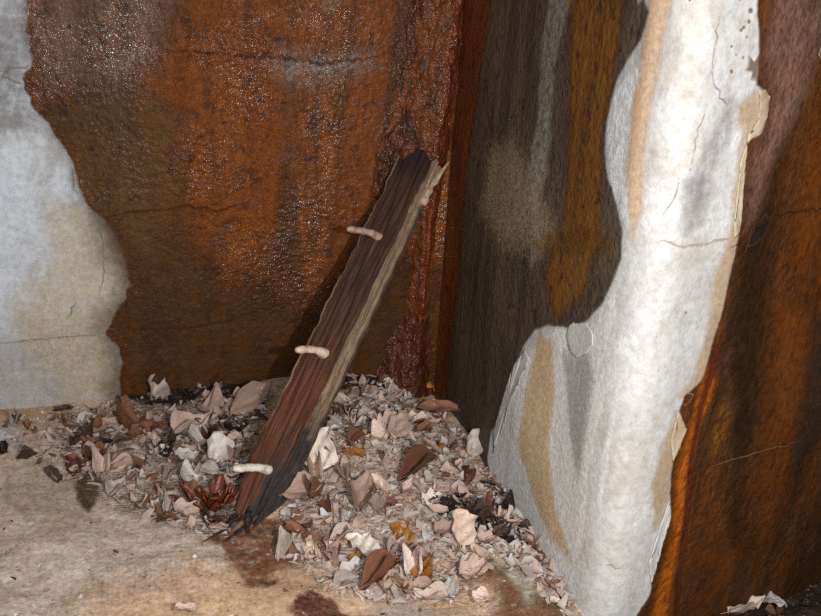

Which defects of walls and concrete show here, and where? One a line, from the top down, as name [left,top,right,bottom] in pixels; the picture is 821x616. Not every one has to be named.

spalling [731,45,760,81]
corrosion [23,0,411,398]
corrosion [428,142,452,395]
peeling [567,322,593,358]
corrosion [637,0,821,616]
crack [659,207,821,253]
peeling [734,89,770,238]
peeling [493,349,530,452]
peeling [671,392,693,462]
peeling [648,500,672,584]